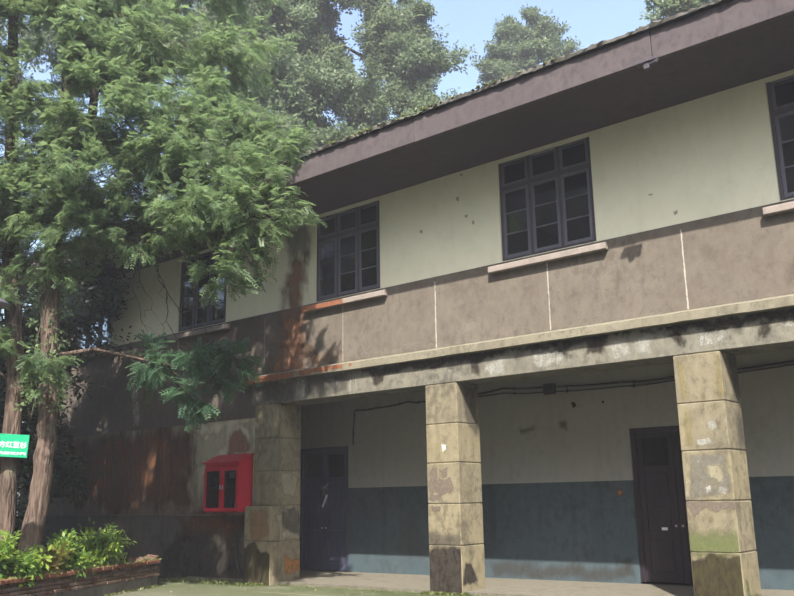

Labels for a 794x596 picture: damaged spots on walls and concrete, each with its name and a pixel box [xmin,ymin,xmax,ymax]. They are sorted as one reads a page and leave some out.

water stain [262,308,794,401]
water stain [161,509,245,578]
water stain [429,534,477,594]
water stain [692,553,750,596]